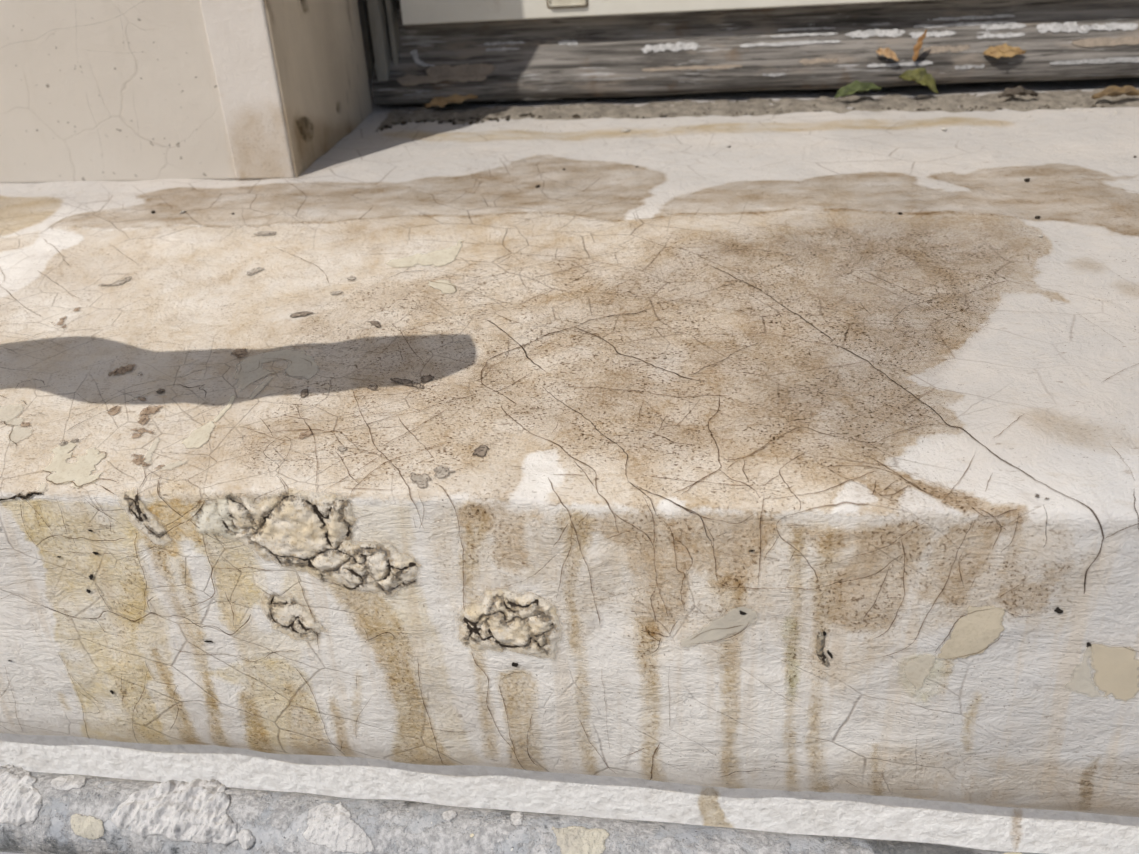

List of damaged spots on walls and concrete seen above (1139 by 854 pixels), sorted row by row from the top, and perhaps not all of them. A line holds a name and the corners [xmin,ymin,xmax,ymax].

crack [263,249,1139,780]
peeling [680,607,757,647]
peeling [938,606,1005,660]
peeling [1088,644,1139,701]